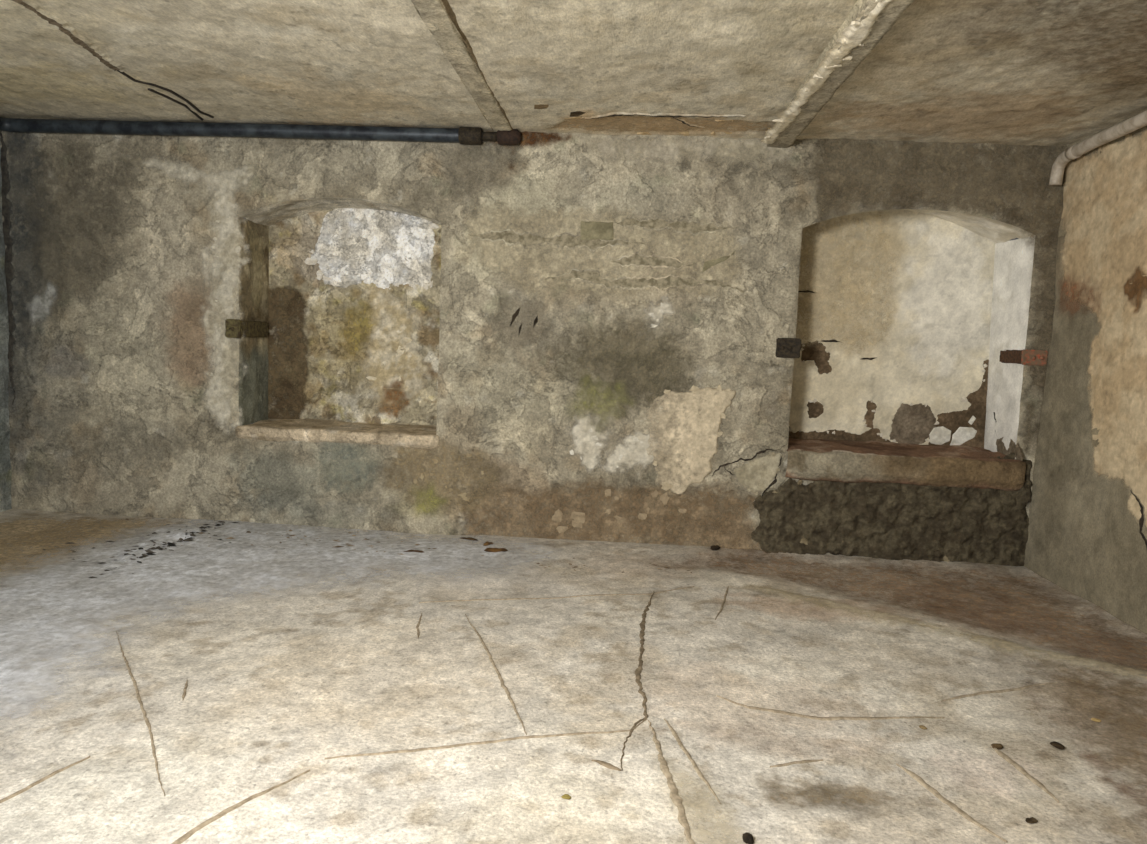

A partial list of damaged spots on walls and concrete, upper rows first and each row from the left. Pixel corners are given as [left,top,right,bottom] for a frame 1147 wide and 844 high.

crack [12,0,125,72]
rust [488,131,571,169]
rust [1124,267,1147,312]
water stain [567,322,682,417]
peeling [801,340,832,374]
spalling [463,360,1033,566]
crack [711,444,786,503]
crack [1130,489,1147,548]
crack [116,630,165,796]
crack [171,586,721,844]
crack [0,756,90,803]
crack [770,759,823,768]